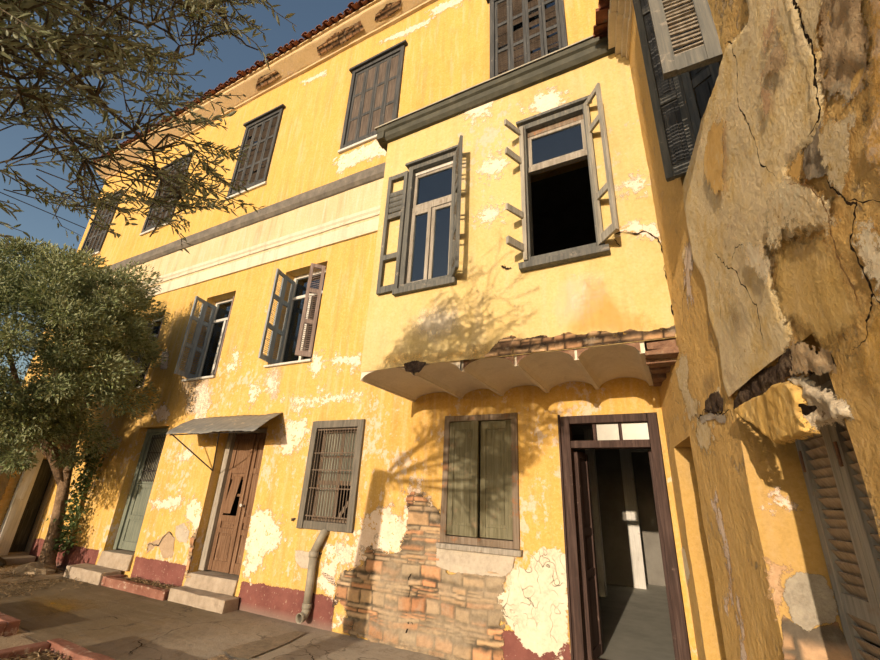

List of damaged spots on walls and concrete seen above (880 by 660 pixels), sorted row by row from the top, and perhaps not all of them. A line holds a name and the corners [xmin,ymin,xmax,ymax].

crack [793,0,821,136]
peeling [331,139,386,174]
crack [727,41,880,350]
spalling [741,0,880,287]
crack [611,230,689,327]
crack [716,244,763,338]
peeling [852,218,880,301]
peeling [248,349,363,456]
flaking render [484,325,854,455]
peeling [242,504,287,586]
flaking render [316,478,569,660]
flaking render [763,557,853,660]